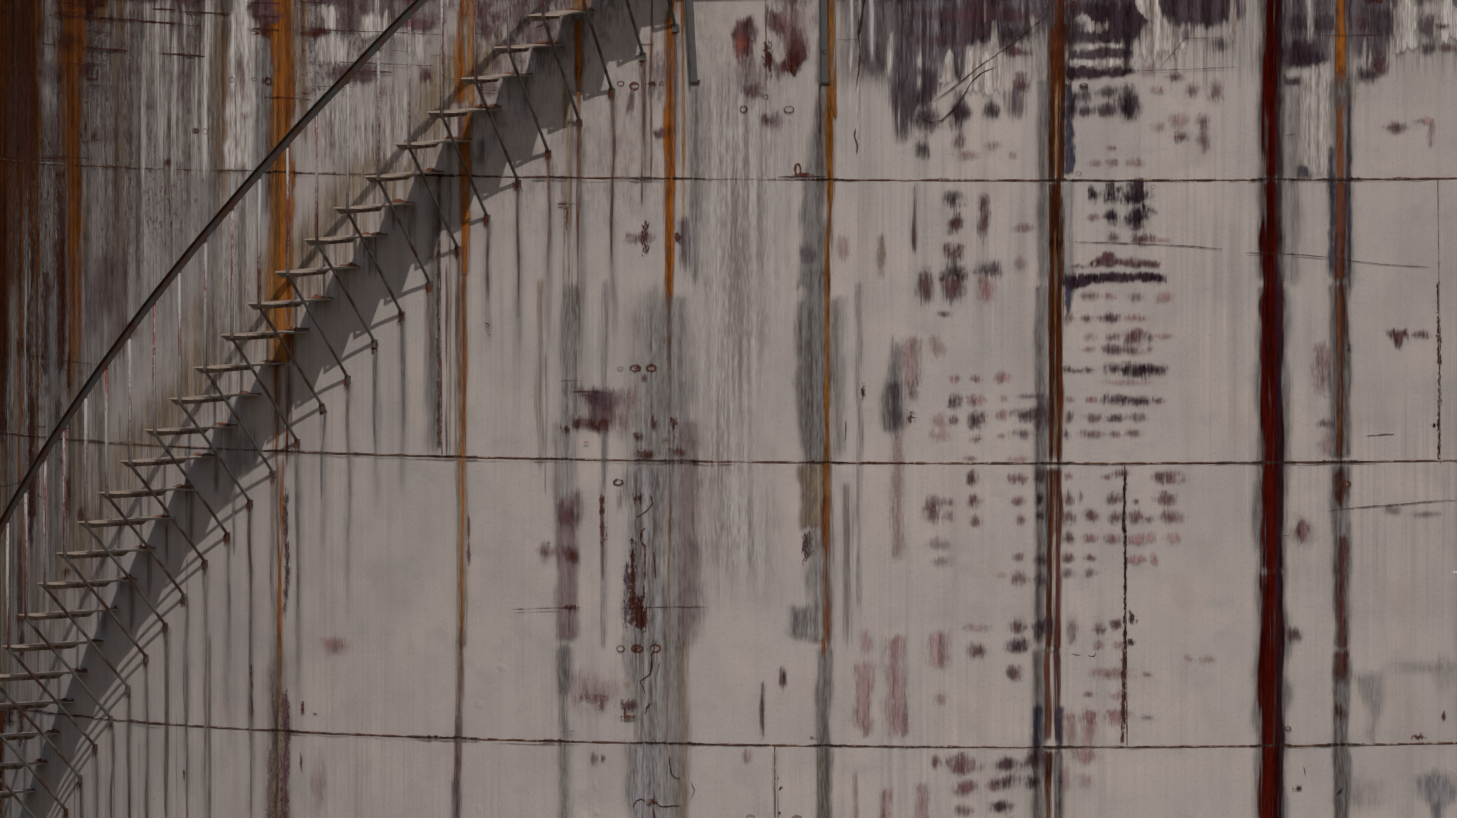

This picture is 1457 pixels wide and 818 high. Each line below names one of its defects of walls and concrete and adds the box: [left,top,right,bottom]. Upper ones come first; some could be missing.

corrosion [0,0,142,818]
corrosion [211,0,705,818]
corrosion [600,417,734,717]
corrosion [630,741,782,815]
corrosion [731,0,807,97]
corrosion [802,0,1429,818]